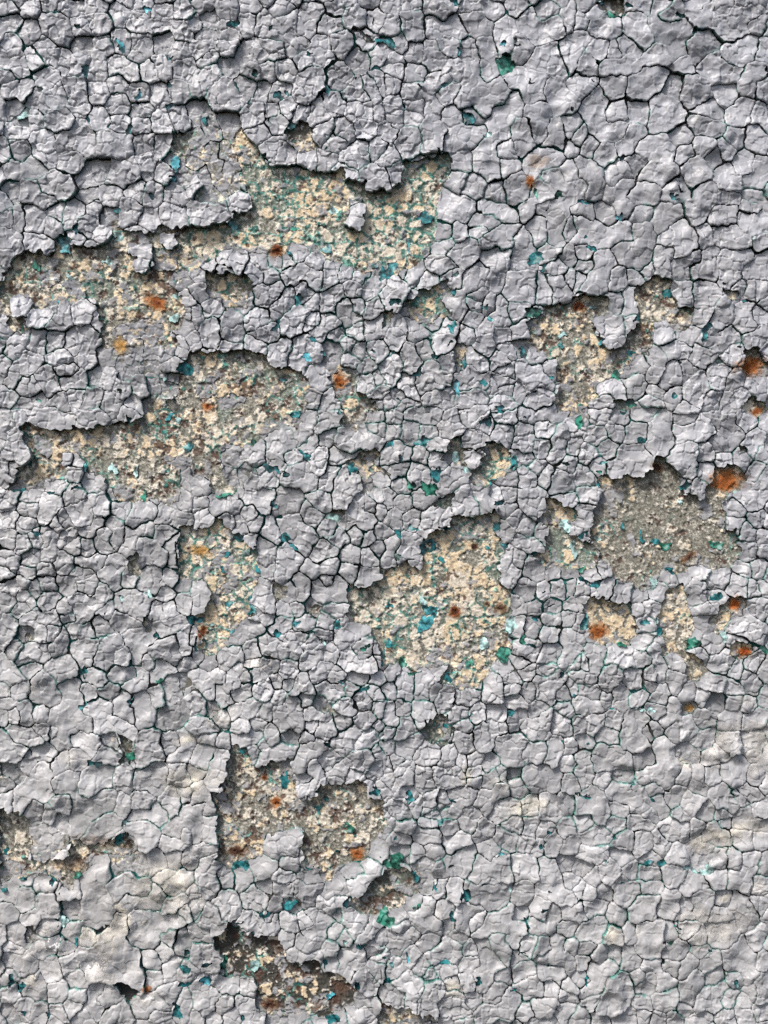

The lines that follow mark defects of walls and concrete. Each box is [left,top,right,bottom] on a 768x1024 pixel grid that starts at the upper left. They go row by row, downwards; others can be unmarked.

crack [275,0,441,109]
crack [437,30,768,337]
rust [144,295,167,311]
peeling [9,336,326,506]
crack [199,264,371,351]
crack [0,395,668,1024]
peeling [333,435,536,691]
rust [589,622,610,640]
peeling [530,455,747,681]
rust [710,469,743,492]
rust [738,356,765,375]
peeling [212,744,438,928]